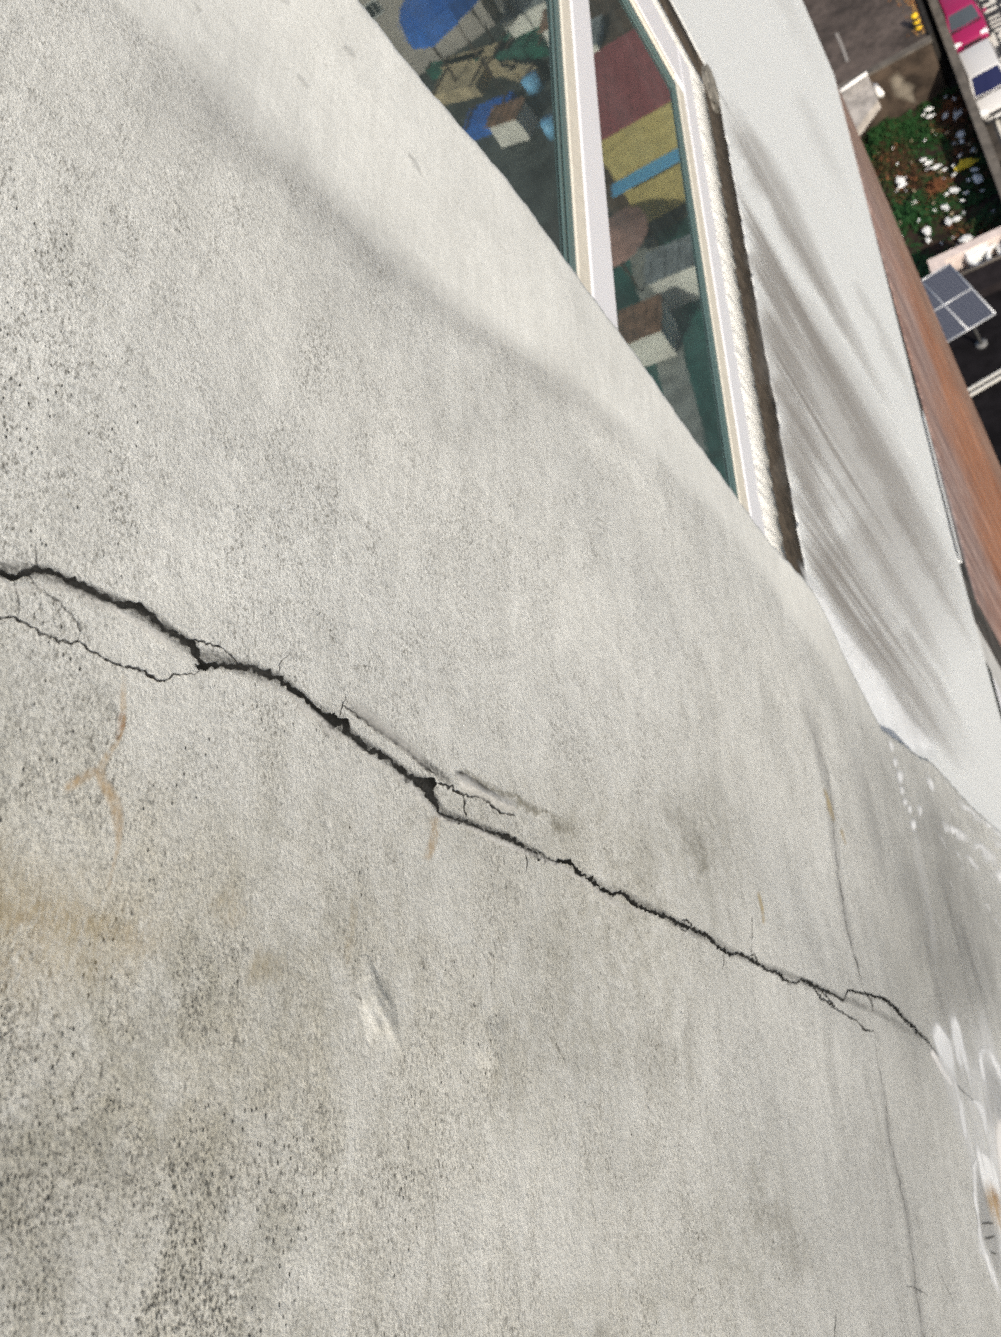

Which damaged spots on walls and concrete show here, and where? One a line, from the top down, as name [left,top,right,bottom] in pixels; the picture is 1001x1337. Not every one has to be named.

crack [0,545,973,1100]